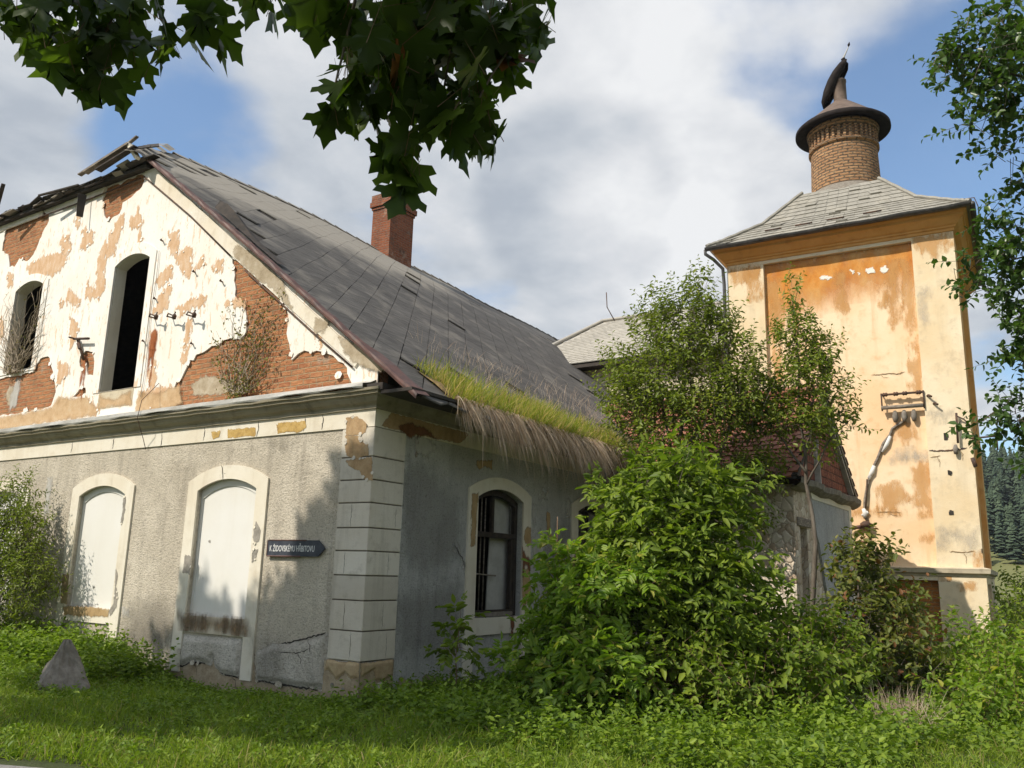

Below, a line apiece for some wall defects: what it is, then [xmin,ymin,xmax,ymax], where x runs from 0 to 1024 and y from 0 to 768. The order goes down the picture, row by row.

flaking render [0,175,145,417]
flaking render [138,230,353,411]
water stain [731,233,954,336]
corrosion [147,330,157,385]
peeling [211,427,256,439]
peeling [277,421,306,434]
peeling [343,415,374,482]
water stain [181,614,247,637]
crack [180,602,351,692]